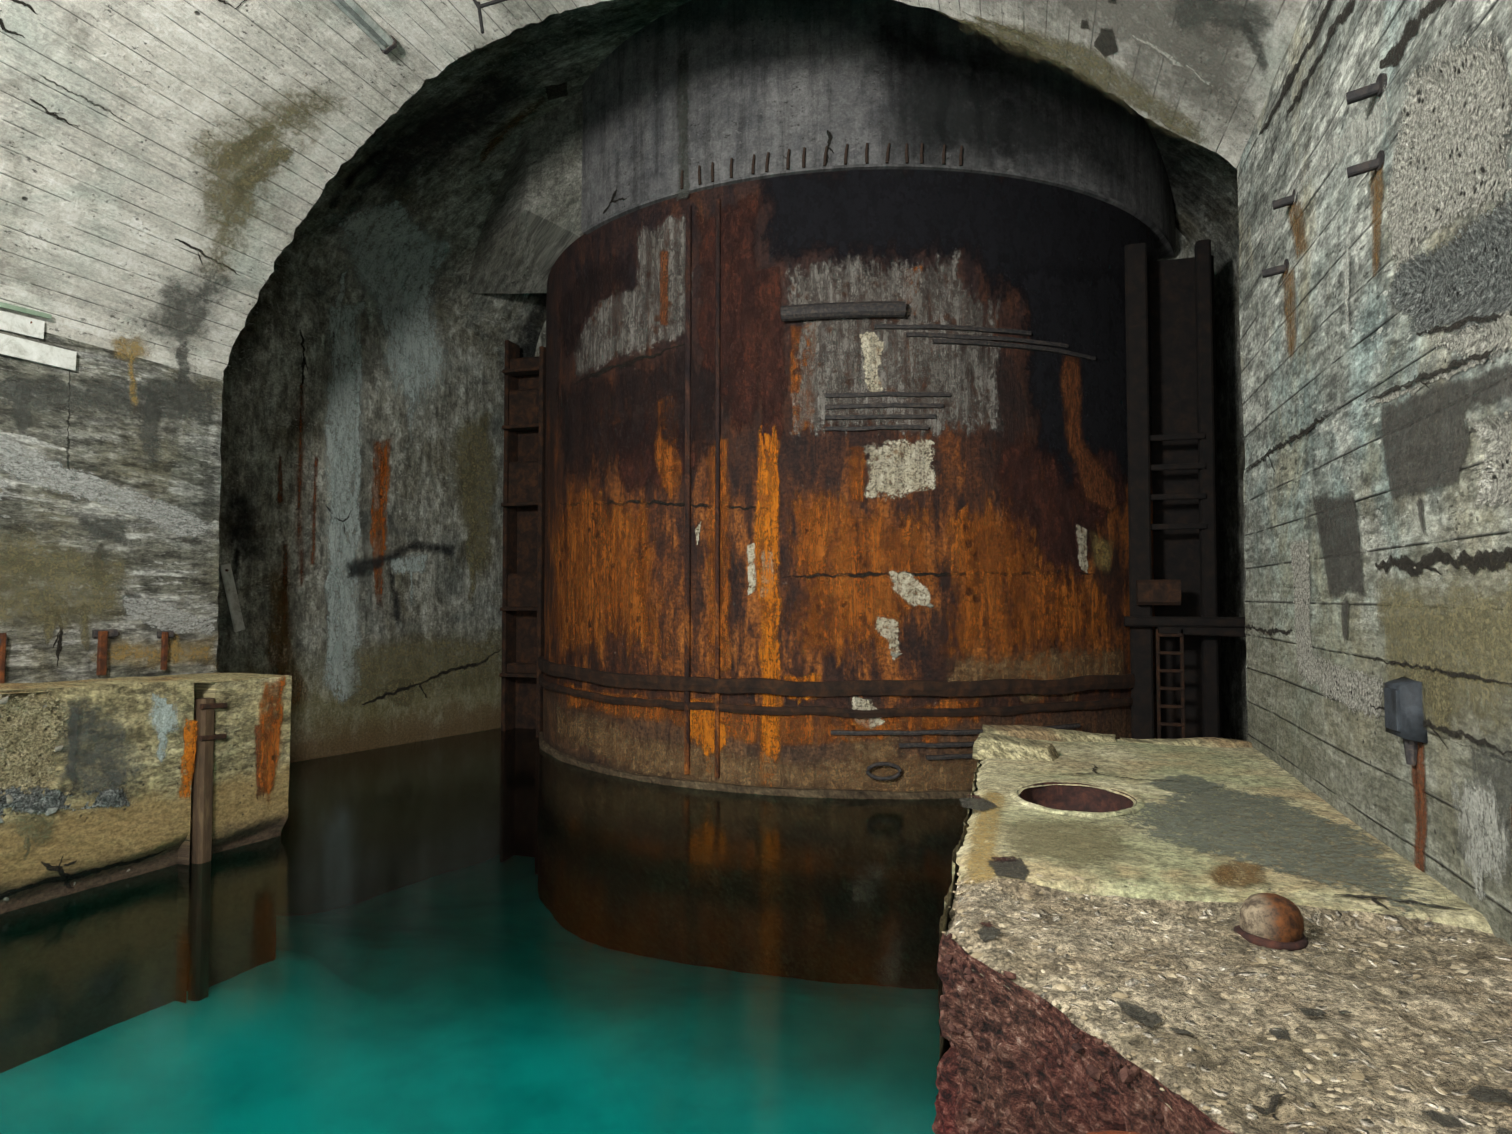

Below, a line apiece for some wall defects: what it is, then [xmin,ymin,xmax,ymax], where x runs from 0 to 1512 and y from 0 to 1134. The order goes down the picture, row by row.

water stain [220,126,293,199]
peeling [574,216,686,376]
peeling [751,143,1160,501]
crack [1366,313,1506,407]
peeling [0,434,215,537]
crack [1246,413,1330,474]
rust [254,382,318,802]
peeling [747,543,774,597]
rust [554,425,978,787]
rust [949,502,1110,655]
rust [179,719,198,798]
rust [1411,742,1427,873]